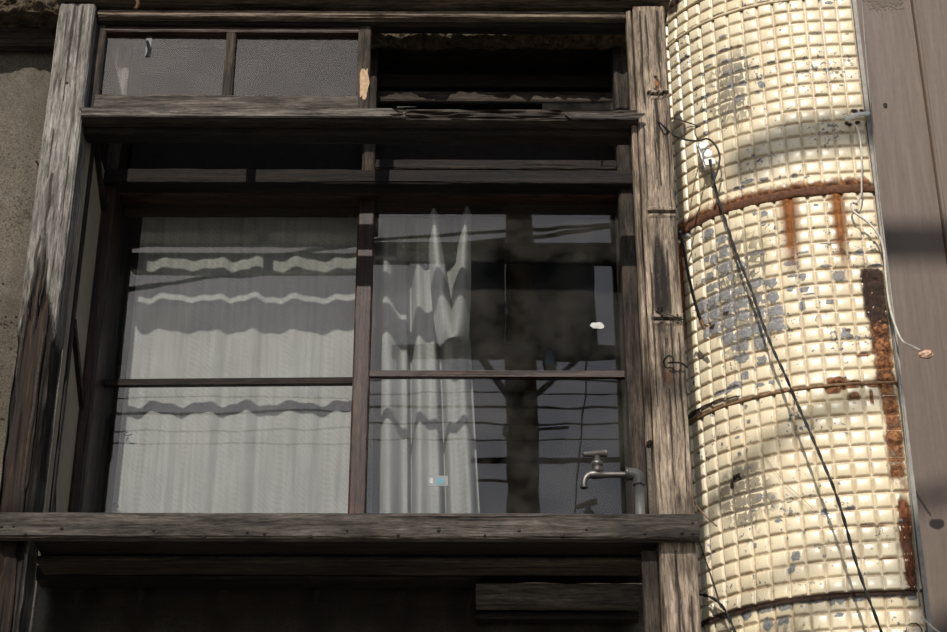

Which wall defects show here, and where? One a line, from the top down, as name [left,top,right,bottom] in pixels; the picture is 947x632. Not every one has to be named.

peeling [700,34,775,102]
peeling [701,93,712,135]
peeling [733,177,768,191]
corrosion [677,177,869,255]
corrosion [678,244,686,325]
peeling [697,228,815,397]
peeling [819,264,846,282]
corrosion [688,395,740,419]
corrosion [826,268,905,483]
peeling [788,551,800,573]
corrosion [701,496,917,628]
peeling [742,592,918,631]